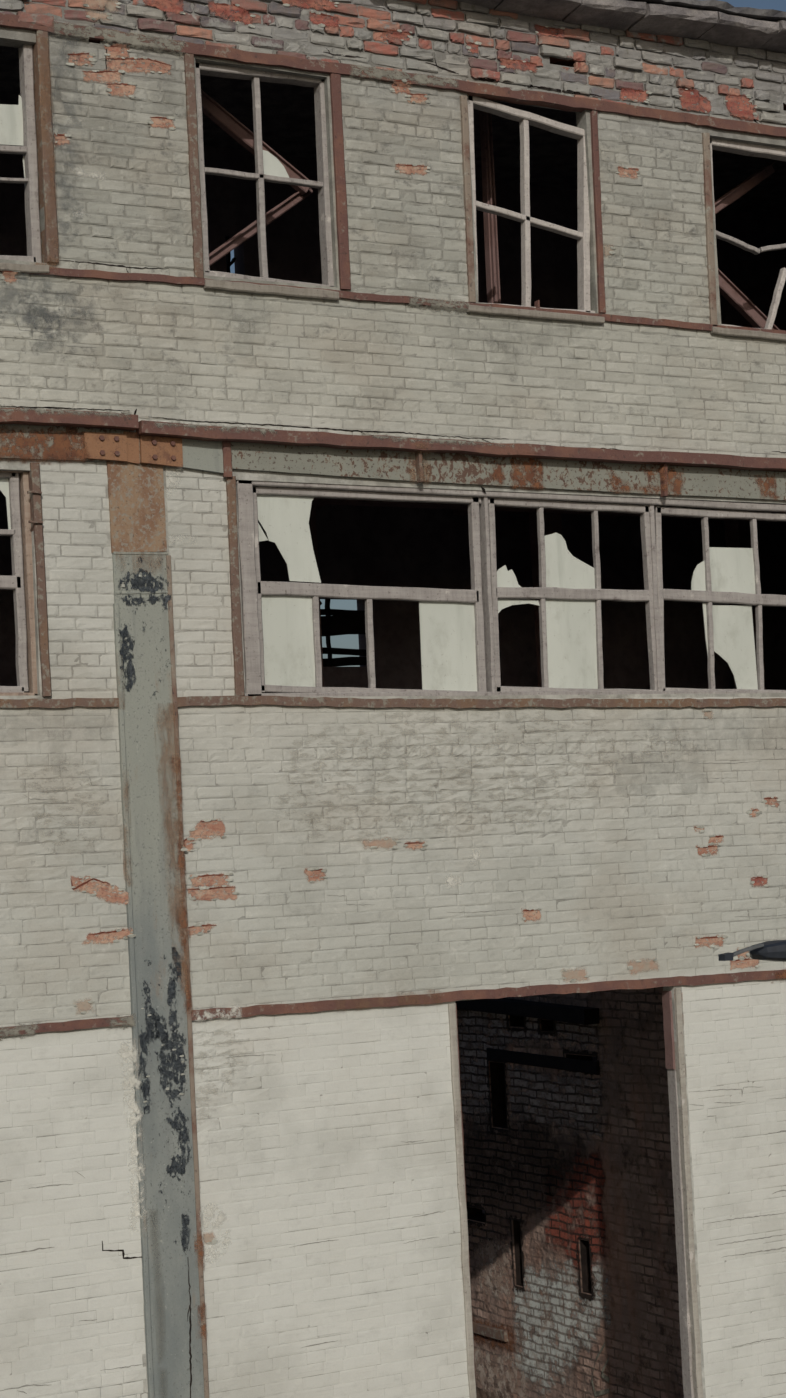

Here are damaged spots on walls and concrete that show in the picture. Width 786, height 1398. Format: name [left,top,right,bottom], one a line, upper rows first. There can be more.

flaking render [54,0,186,98]
rust [0,428,88,464]
rust [493,458,543,490]
rust [611,464,682,495]
peeling [118,557,174,708]
flaking render [181,818,227,854]
flaking render [71,876,129,904]
flaking render [187,872,239,901]
flaking render [83,923,217,944]
peeling [110,947,218,1252]
crack [102,1241,142,1259]
crack [185,1263,193,1398]